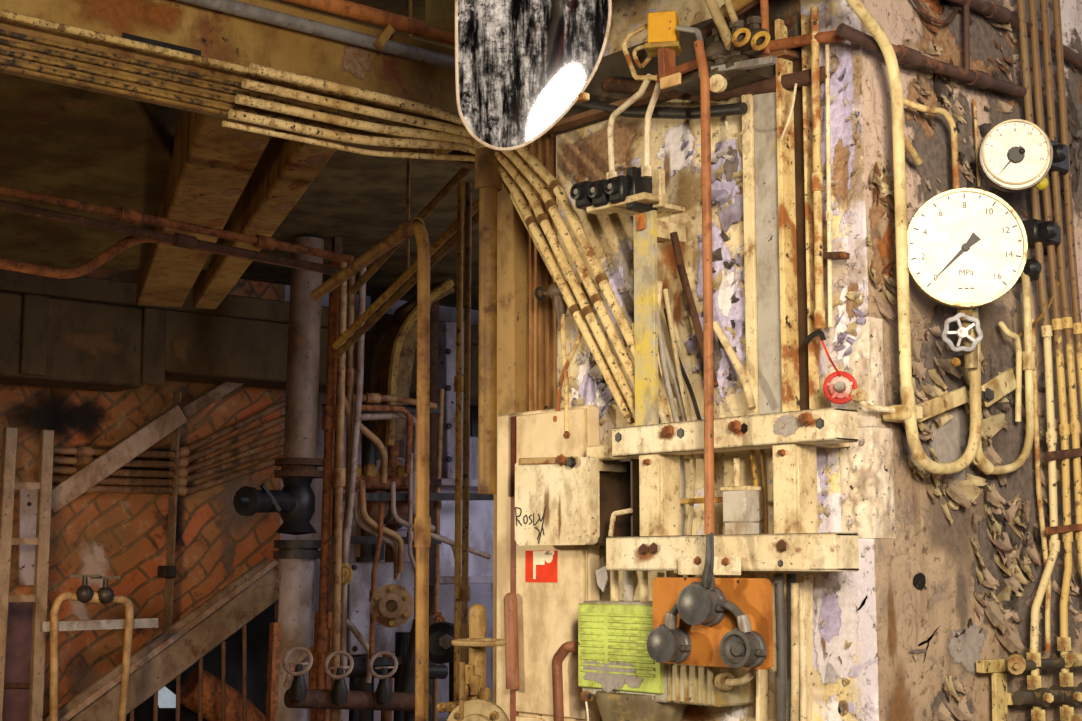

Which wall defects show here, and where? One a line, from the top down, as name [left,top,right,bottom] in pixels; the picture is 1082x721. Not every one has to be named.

peeling [657,123,696,177]
peeling [811,41,861,210]
peeling [684,138,746,405]
damp [70,400,102,439]
peeling [832,0,1082,721]
peeling [813,571,860,721]